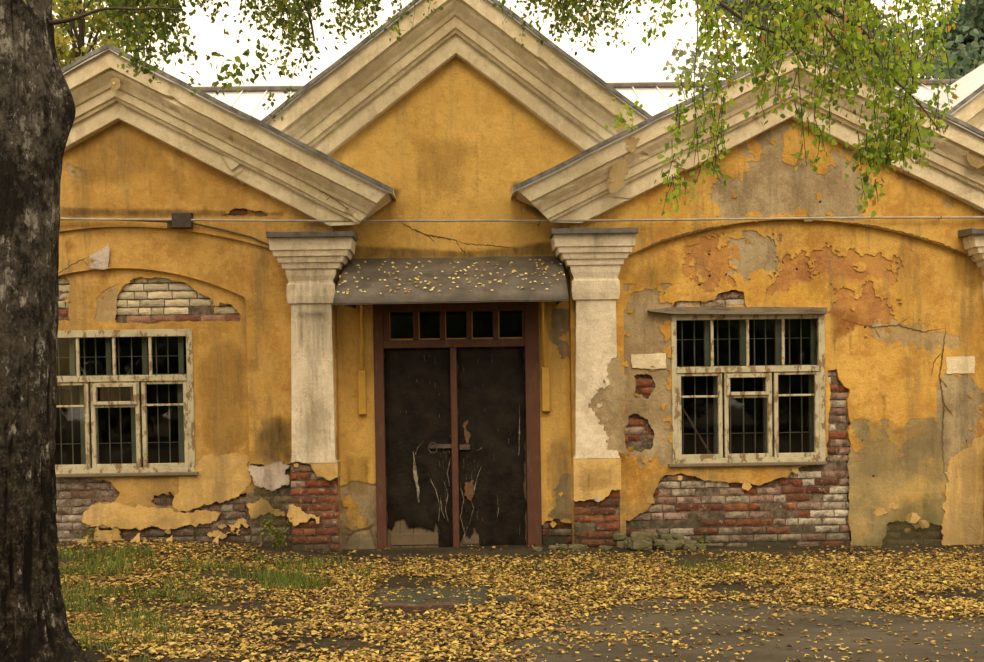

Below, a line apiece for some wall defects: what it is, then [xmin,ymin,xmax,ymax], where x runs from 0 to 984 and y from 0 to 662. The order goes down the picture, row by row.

peeling [89,244,110,270]
spalling [94,277,241,324]
crack [402,223,512,252]
spalling [542,123,984,548]
crack [841,319,954,466]
spalling [56,457,377,553]